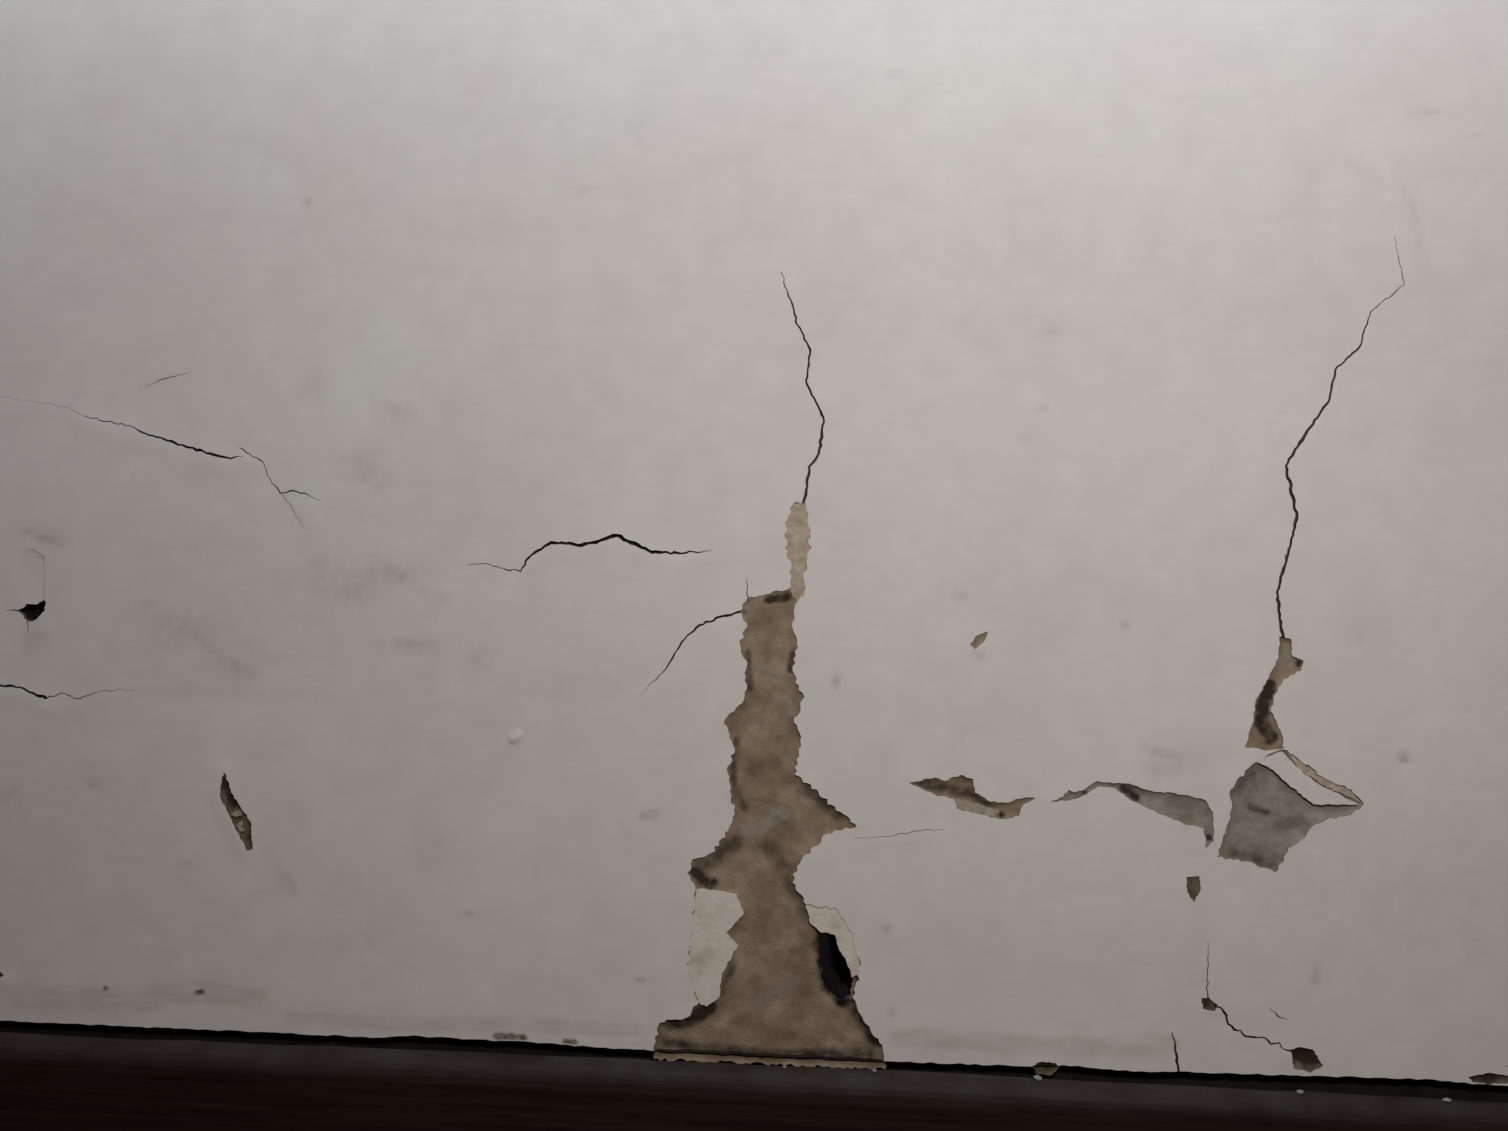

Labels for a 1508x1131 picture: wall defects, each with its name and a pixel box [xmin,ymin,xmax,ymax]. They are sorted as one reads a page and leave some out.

crack [6,397,320,529]
crack [781,272,825,503]
crack [1276,237,1405,639]
spalling [8,548,46,632]
crack [0,684,129,700]
crack [468,534,712,572]
crack [645,581,749,691]
flaking render [970,632,988,649]
flaking render [220,773,253,851]
flaking render [653,502,886,1069]
flaking render [909,636,1364,872]
crack [1206,953,1293,1053]